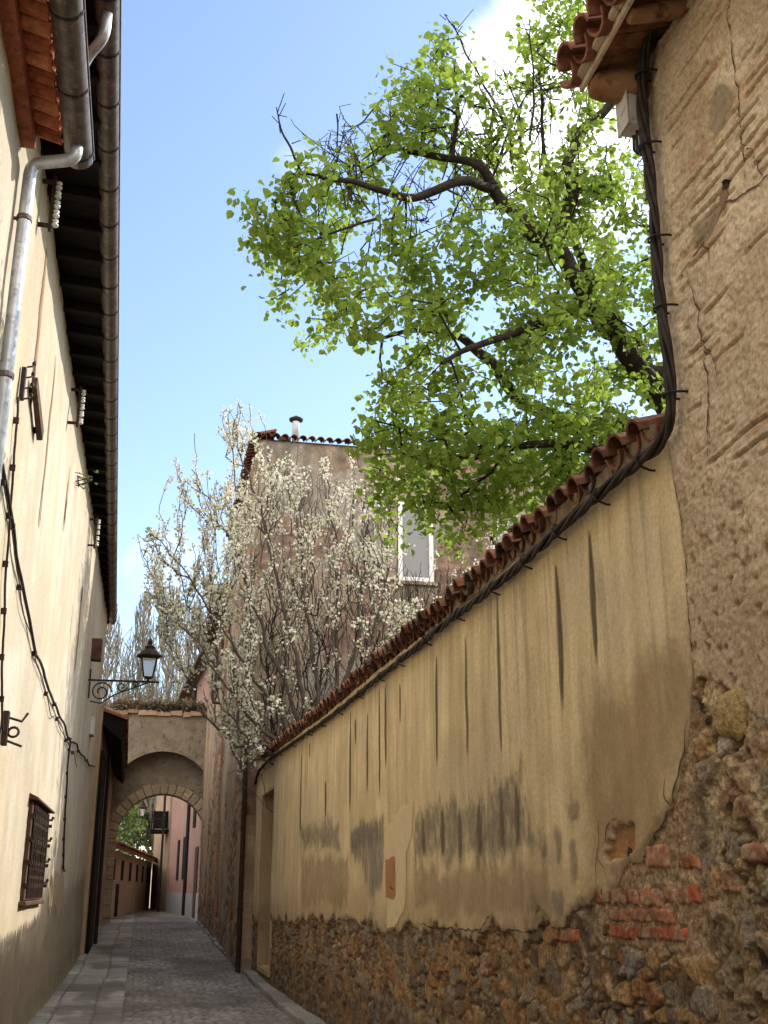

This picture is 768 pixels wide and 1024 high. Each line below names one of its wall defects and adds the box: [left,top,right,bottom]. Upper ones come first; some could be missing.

crack [681,0,768,453]
water stain [555,566,563,701]
water stain [588,534,597,655]
water stain [299,743,384,895]
peeling [385,802,413,928]
water stain [414,762,576,875]
flaking render [595,884,703,942]
flaking render [605,819,701,869]
flaking render [717,789,739,817]
flaking render [740,842,768,864]
peeling [758,947,768,970]